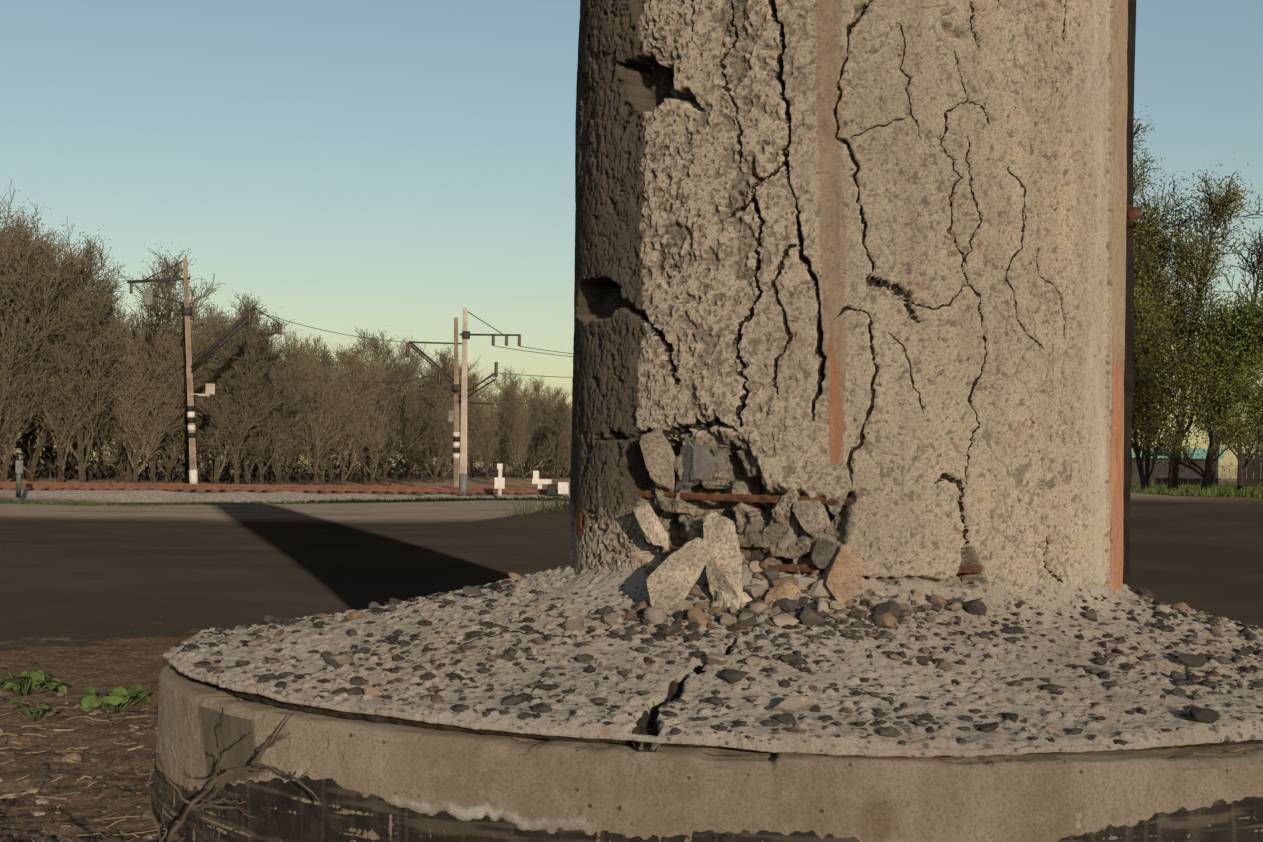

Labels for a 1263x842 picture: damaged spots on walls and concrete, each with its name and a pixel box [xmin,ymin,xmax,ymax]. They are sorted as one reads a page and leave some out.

crack [599,0,1065,583]
corrosion [828,341,842,465]
spalling [631,432,851,576]
corrosion [1109,363,1125,591]
damp [200,706,265,790]
crack [194,645,733,752]
crack [1008,740,1263,756]
efflorescence [450,805,528,827]